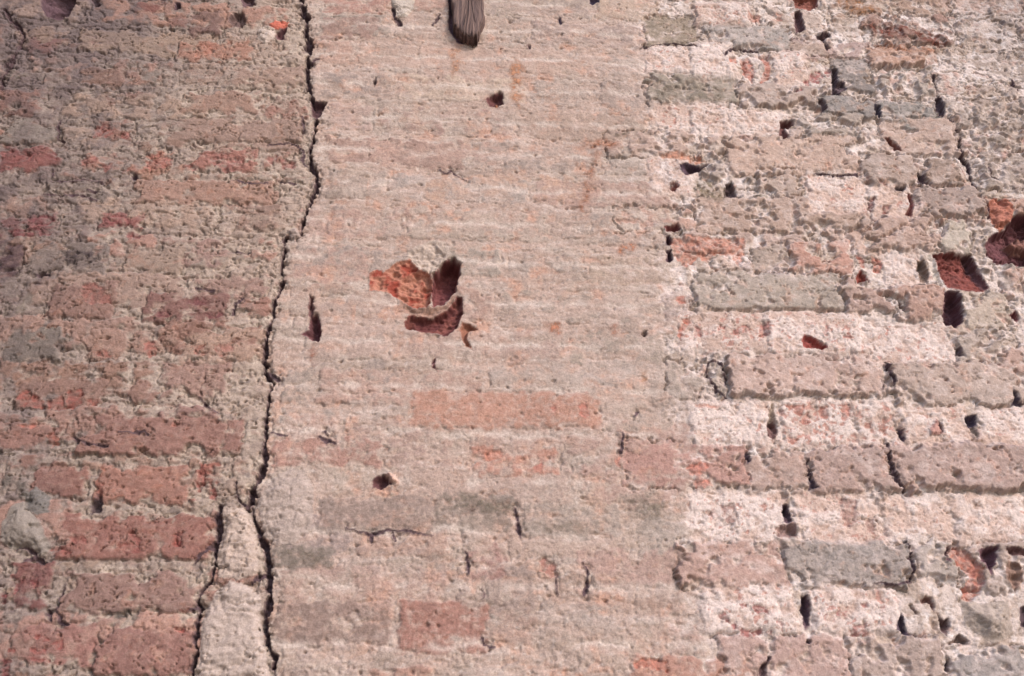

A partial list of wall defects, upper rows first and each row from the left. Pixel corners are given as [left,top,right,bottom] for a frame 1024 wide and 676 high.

spalling [484,90,505,109]
spalling [925,197,1024,294]
spalling [368,240,480,350]
crack [184,0,327,676]
spalling [371,472,400,490]
crack [344,523,435,546]
spalling [948,544,987,601]
spalling [1005,544,1024,557]